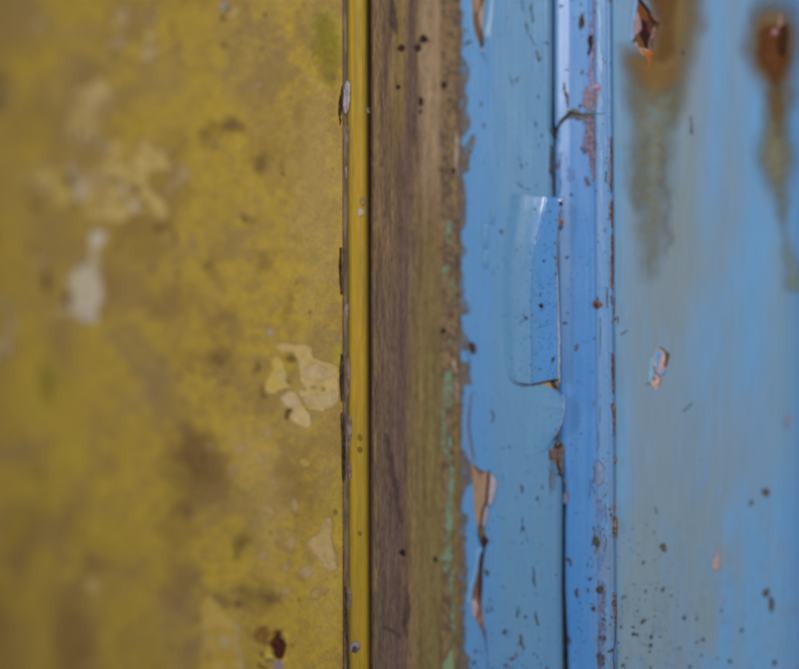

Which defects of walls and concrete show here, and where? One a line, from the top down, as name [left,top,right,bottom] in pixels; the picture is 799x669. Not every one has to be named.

peeling [59,229,105,324]
peeling [68,76,113,145]
peeling [73,138,189,255]
peeling [265,327,350,428]
peeling [459,0,497,669]
crack [549,0,603,198]
peeling [580,0,601,187]
peeling [634,12,642,35]
peeling [645,347,669,389]
rust [626,0,697,257]
rust [749,0,795,208]
crack [561,472,569,669]